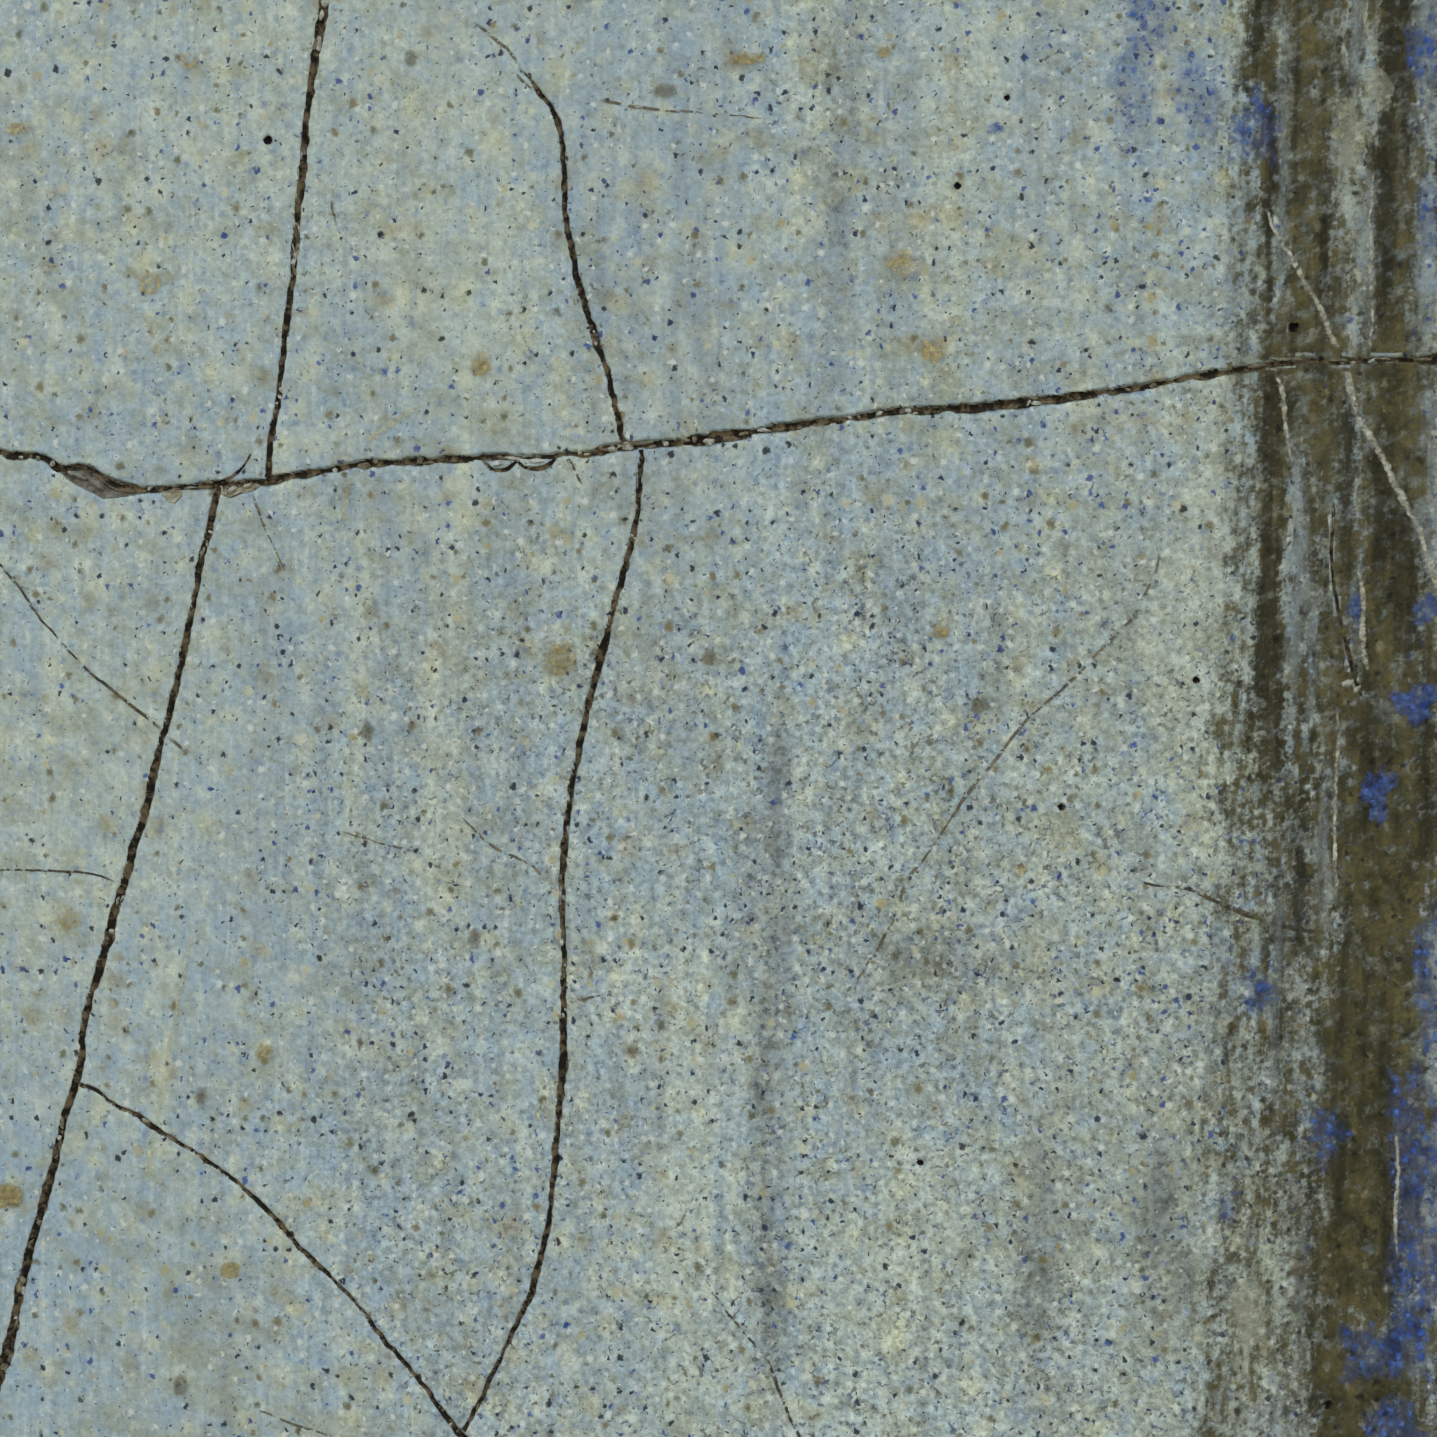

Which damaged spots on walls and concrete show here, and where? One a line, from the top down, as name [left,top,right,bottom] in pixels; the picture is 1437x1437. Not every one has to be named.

crack [0,485,468,1437]
crack [462,449,645,1432]
crack [0,0,1437,493]
damp [1176,0,1437,1437]